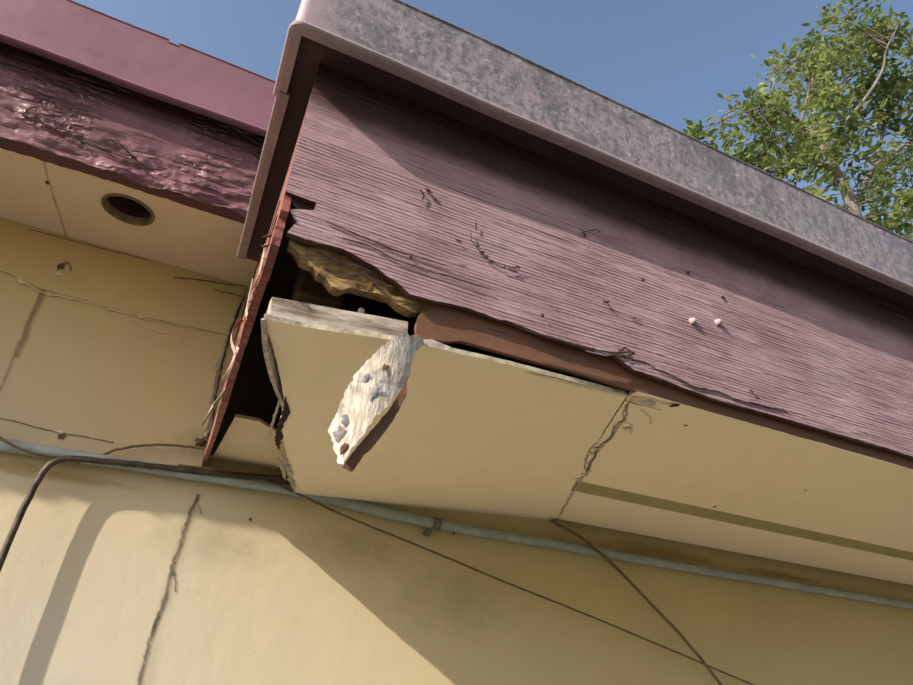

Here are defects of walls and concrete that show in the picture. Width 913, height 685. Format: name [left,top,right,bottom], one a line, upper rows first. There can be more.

crack [1,95,234,196]
crack [173,201,280,352]
peeling [201,244,265,426]
peeling [328,333,451,472]
peeling [328,222,491,290]
crack [555,398,632,521]
peeling [515,326,789,412]
crack [138,494,202,685]